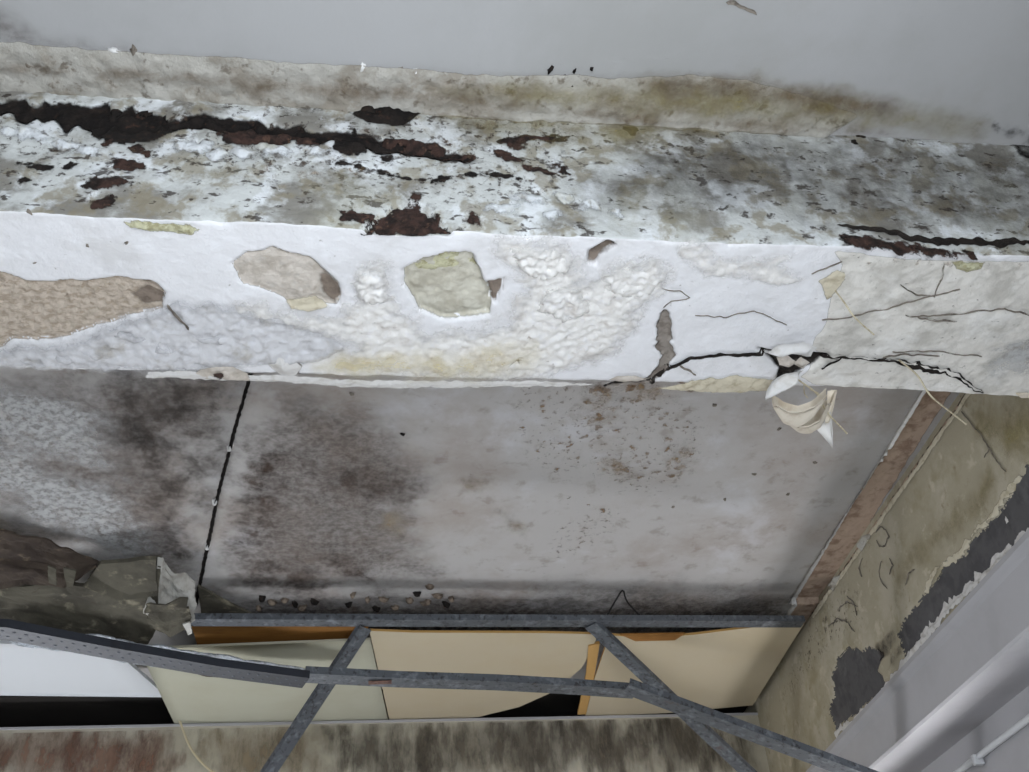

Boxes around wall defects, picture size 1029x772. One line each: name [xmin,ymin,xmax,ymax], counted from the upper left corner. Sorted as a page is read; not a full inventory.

flaking render [0,271,165,347]
flaking render [234,246,341,312]
flaking render [404,251,502,317]
crack [603,288,787,388]
crack [811,224,1029,322]
damp [0,385,218,557]
crack [196,373,253,605]
damp [241,414,407,590]
damp [520,383,695,490]
crack [818,350,1006,472]
peeling [829,464,1029,738]
damp [340,718,732,772]